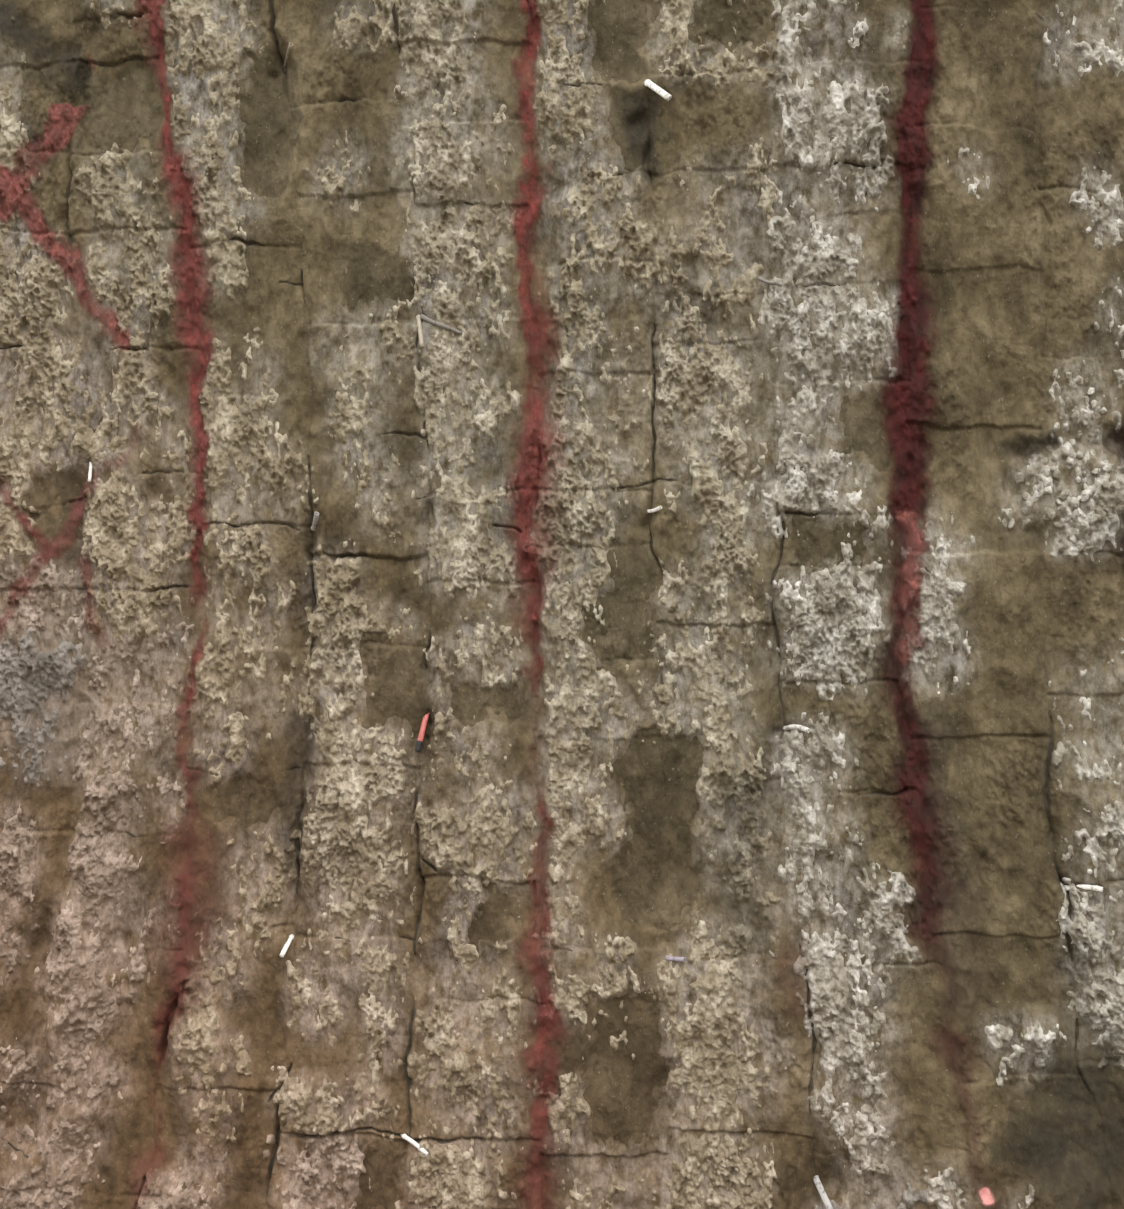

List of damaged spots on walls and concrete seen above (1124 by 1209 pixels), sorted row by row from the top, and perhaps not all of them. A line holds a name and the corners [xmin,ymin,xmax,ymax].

crack [415,307,423,373]
crack [393,421,428,447]
crack [209,520,240,528]
crack [281,454,413,656]
crack [422,624,431,669]
crack [771,511,818,739]
crack [288,767,304,910]
crack [404,787,438,955]
crack [524,880,573,951]
crack [267,1006,469,1196]
crack [799,944,817,1115]